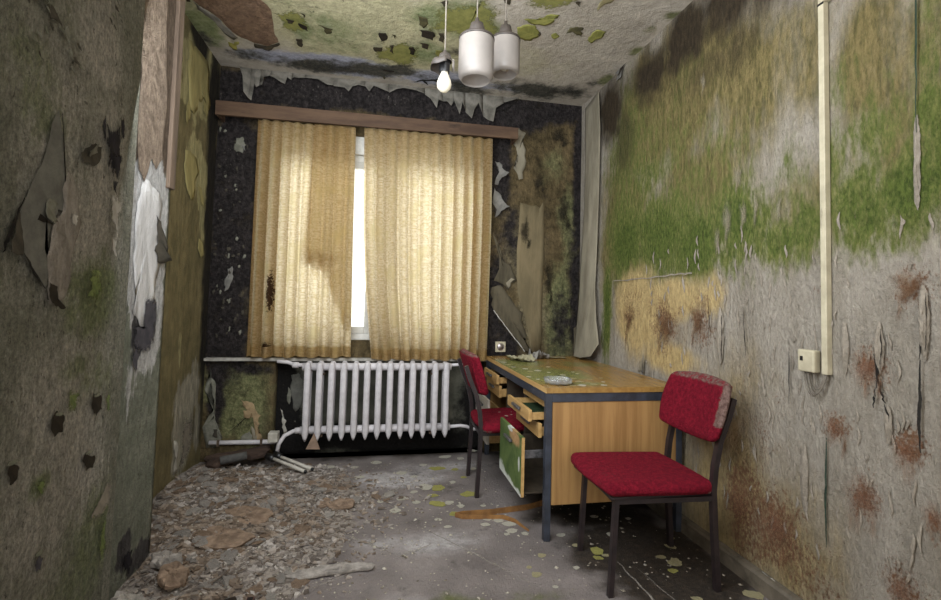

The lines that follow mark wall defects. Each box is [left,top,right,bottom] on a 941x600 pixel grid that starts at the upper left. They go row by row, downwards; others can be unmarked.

spalling [186,0,307,51]
peeling [373,0,511,79]
peeling [517,0,606,43]
peeling [186,39,211,124]
flaking render [3,110,66,309]
spalling [81,143,102,166]
spalling [132,0,172,327]
peeling [184,150,204,206]
peeling [224,137,248,154]
flaking render [198,237,246,338]
crack [872,354,889,419]
crack [915,344,923,453]